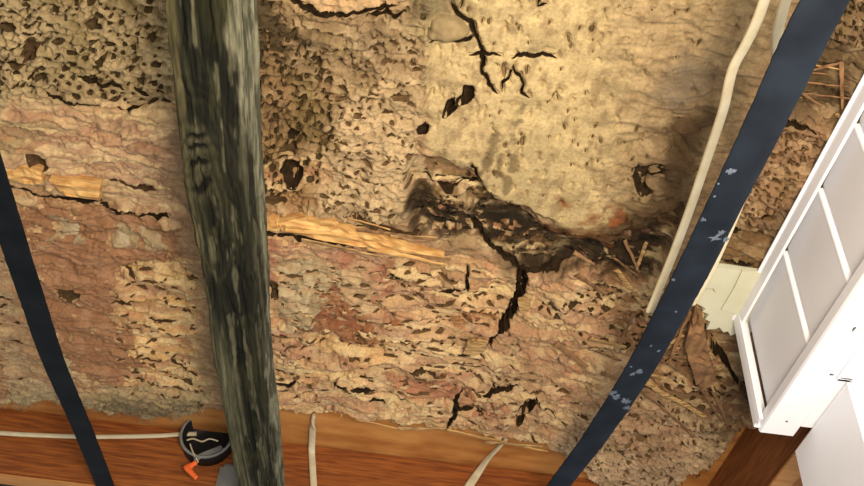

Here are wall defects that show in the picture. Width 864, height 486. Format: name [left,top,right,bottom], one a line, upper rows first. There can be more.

spalling [0,0,171,105]
crack [291,0,407,19]
crack [429,0,557,98]
crack [10,178,169,221]
spalling [259,29,665,352]
crack [437,165,570,357]
crack [410,367,440,379]
crack [447,384,519,429]
spalling [587,372,734,486]